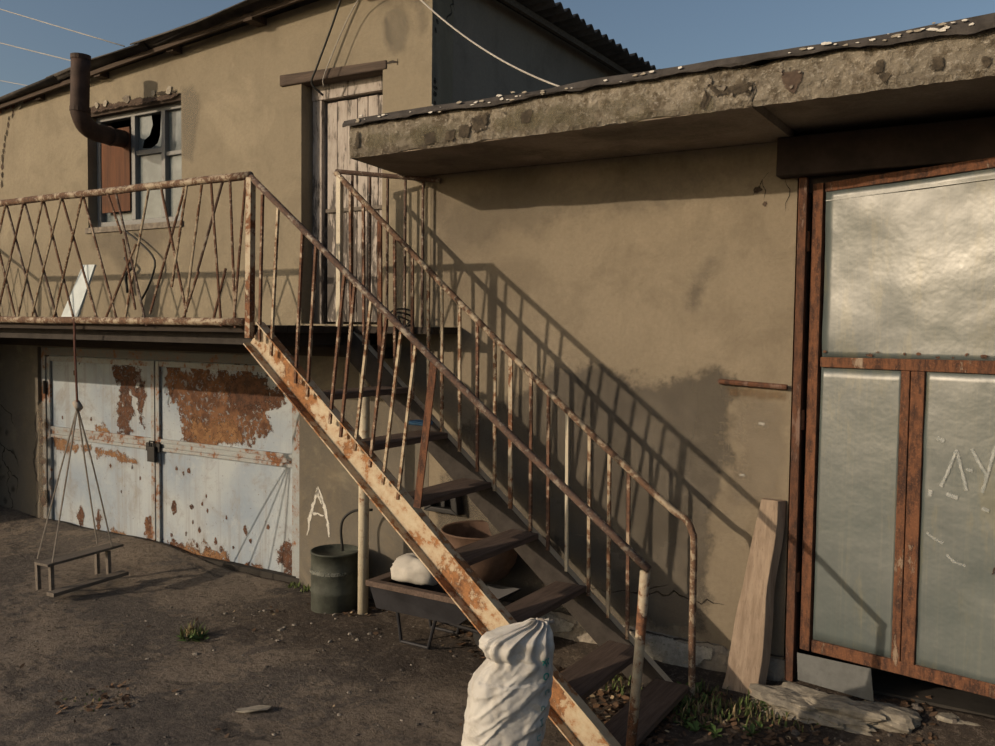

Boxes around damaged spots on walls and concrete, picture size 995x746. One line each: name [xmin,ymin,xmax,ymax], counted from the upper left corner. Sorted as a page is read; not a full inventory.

peeling [788,19,975,53]
spalling [700,79,752,109]
spalling [779,69,803,93]
spalling [874,59,891,84]
corrosion [90,364,147,435]
corrosion [162,361,286,448]
corrosion [53,438,141,480]
corrosion [143,494,235,562]
damp [437,495,499,536]
damp [453,365,741,632]
corrosion [277,538,292,575]
crack [585,583,723,605]